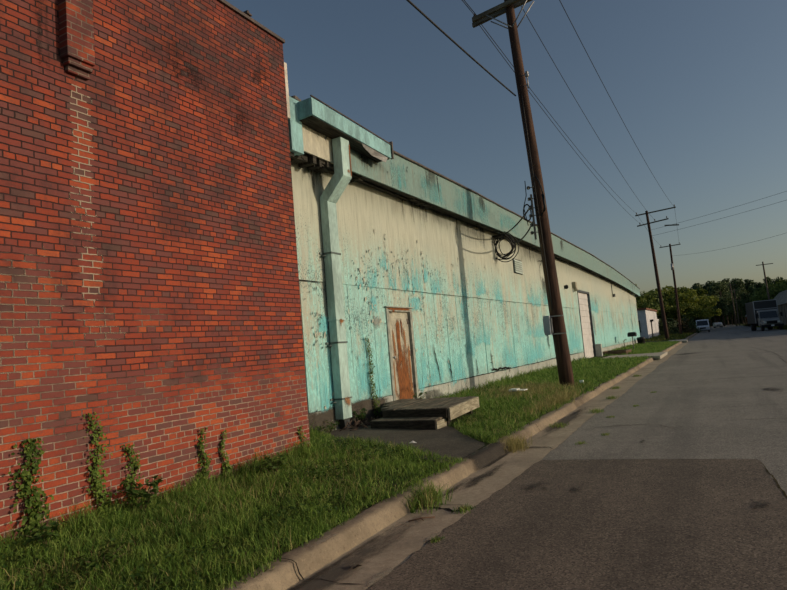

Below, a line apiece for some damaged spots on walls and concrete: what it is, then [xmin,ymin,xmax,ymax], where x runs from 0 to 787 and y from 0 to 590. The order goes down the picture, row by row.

rust [387,308,414,399]
peeling [351,229,548,401]